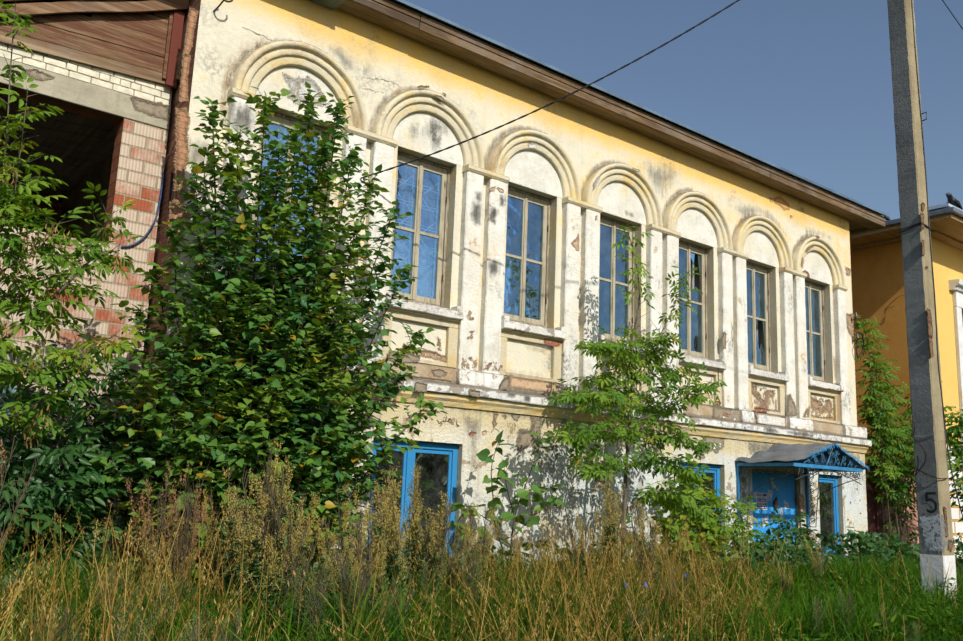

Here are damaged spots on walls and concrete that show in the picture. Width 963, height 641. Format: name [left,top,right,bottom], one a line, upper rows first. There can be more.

peeling [469,412,559,459]